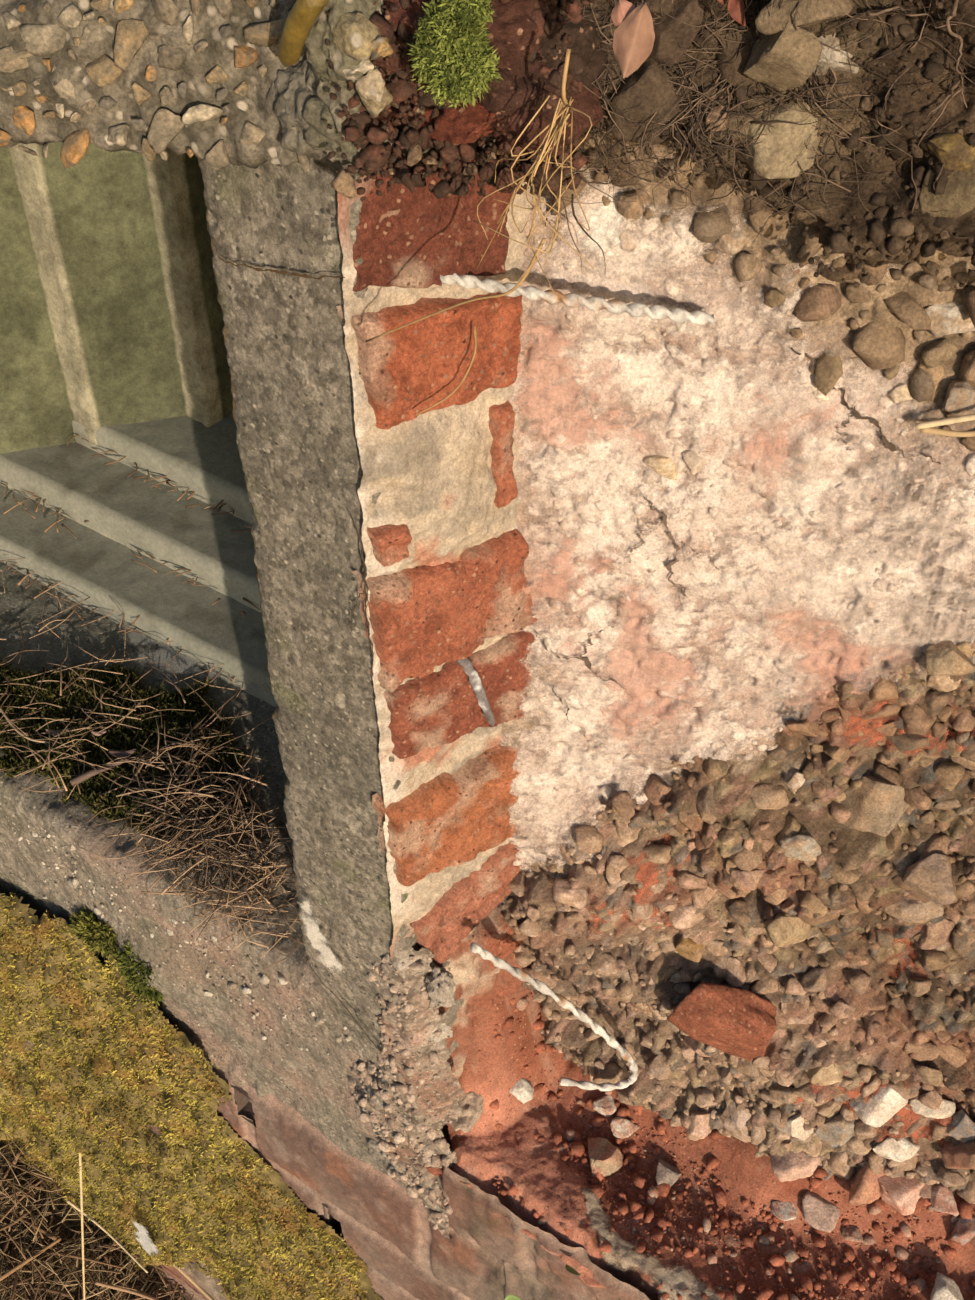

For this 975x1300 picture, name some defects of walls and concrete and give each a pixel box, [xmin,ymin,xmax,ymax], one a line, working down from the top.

crack [791,347,941,464]
crack [626,497,719,598]
spalling [349,947,485,1239]